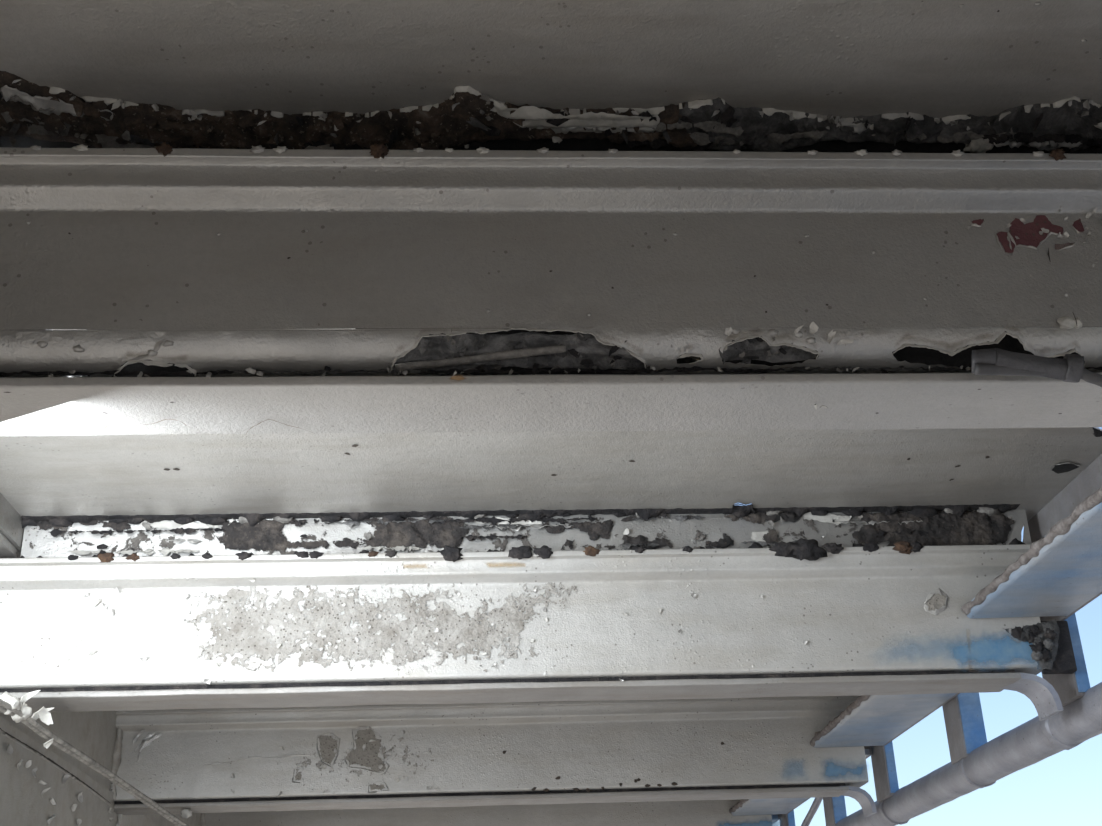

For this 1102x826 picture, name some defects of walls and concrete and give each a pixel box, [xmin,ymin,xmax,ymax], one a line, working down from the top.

corrosion [0,85,261,157]
corrosion [363,133,458,159]
corrosion [767,120,1082,161]
peeling [995,206,1102,260]
spalling [112,338,212,377]
spalling [387,365,656,375]
spalling [676,354,703,364]
spalling [717,346,819,372]
peeling [793,322,853,345]
spalling [881,331,1034,374]
corrosion [29,503,1015,566]